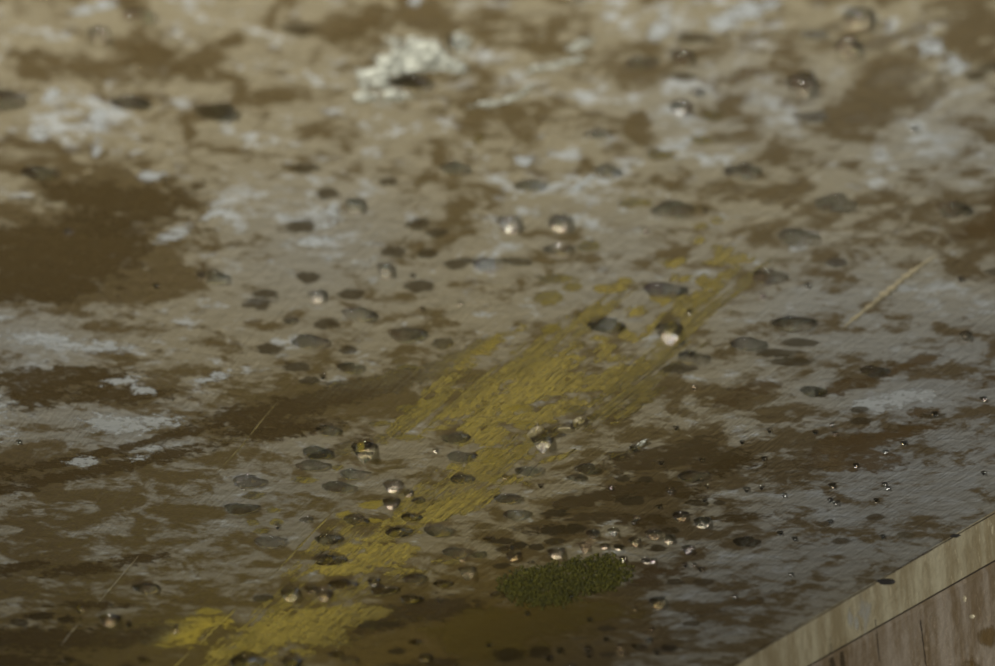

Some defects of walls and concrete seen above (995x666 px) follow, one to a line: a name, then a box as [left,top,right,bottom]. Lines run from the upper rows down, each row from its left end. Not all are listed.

leakage [0,171,230,320]
leakage [287,188,341,247]
leakage [620,198,651,207]
leakage [0,216,782,666]
spalling [526,415,598,438]
spalling [609,439,650,460]